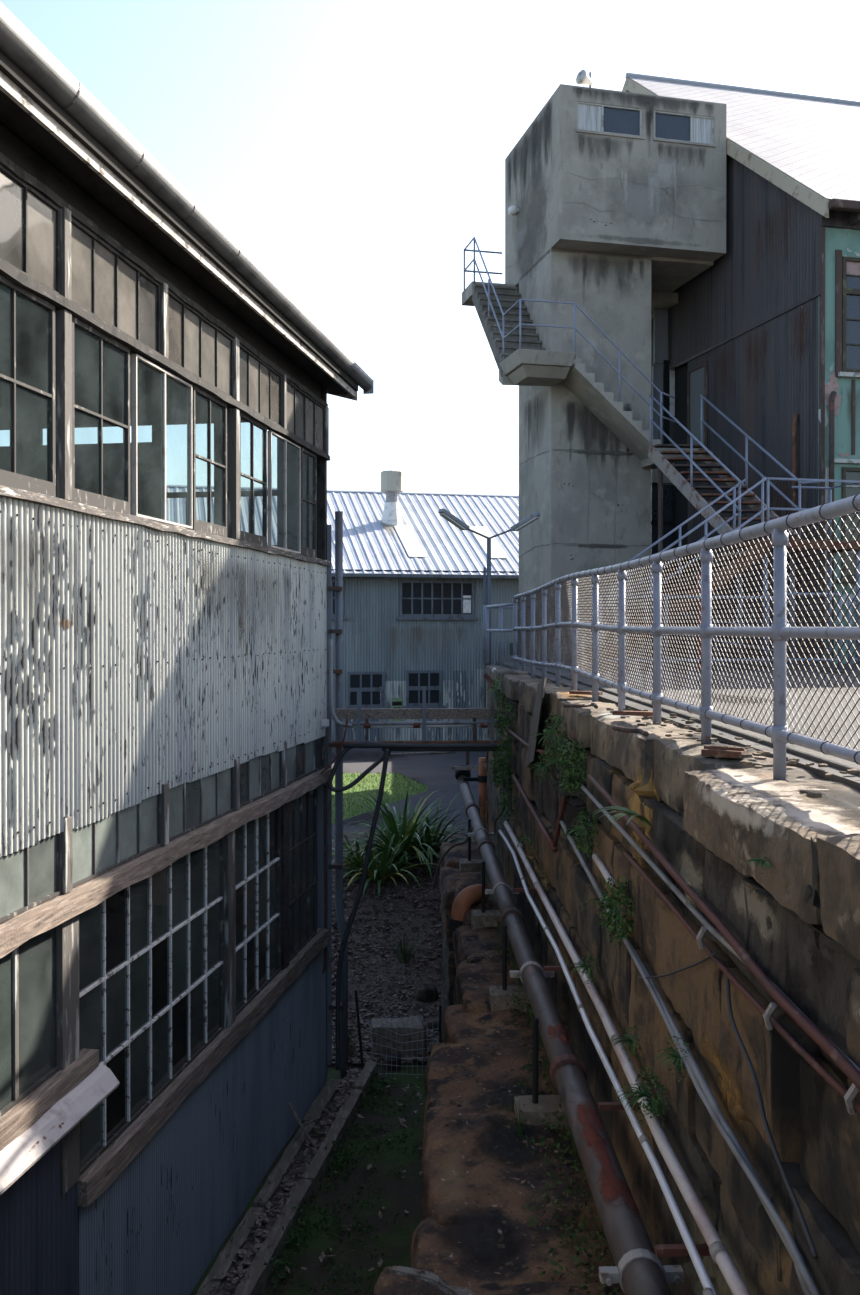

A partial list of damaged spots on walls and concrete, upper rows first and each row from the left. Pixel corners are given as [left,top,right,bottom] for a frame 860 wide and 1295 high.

damp [578,89,712,135]
damp [508,107,551,271]
peeling [4,507,100,808]
peeling [130,531,159,702]
peeling [179,578,225,721]
peeling [245,614,262,712]
damp [444,1210,515,1261]